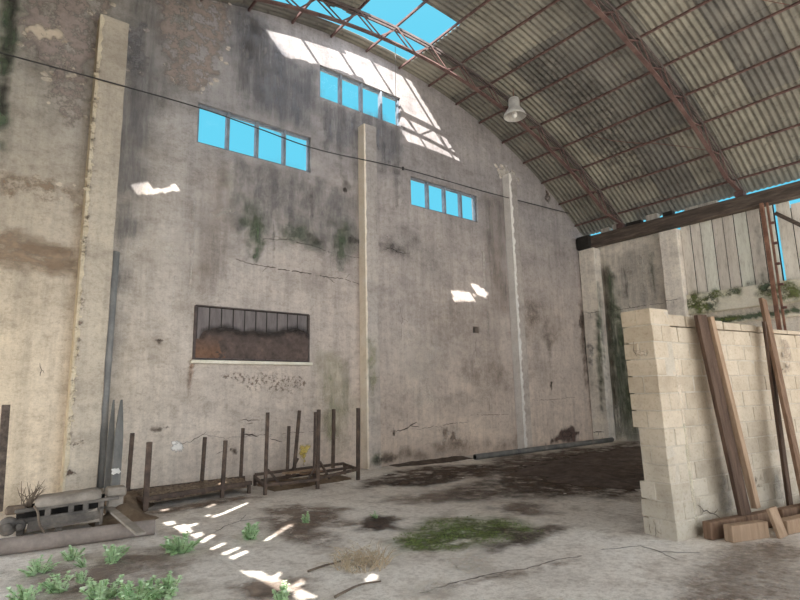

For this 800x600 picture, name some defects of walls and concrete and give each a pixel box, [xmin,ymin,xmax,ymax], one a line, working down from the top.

water stain [0,232,72,273]
water stain [242,219,264,262]
crack [236,224,359,284]
spalling [223,373,306,394]
water stain [364,268,638,500]
crack [396,405,504,432]